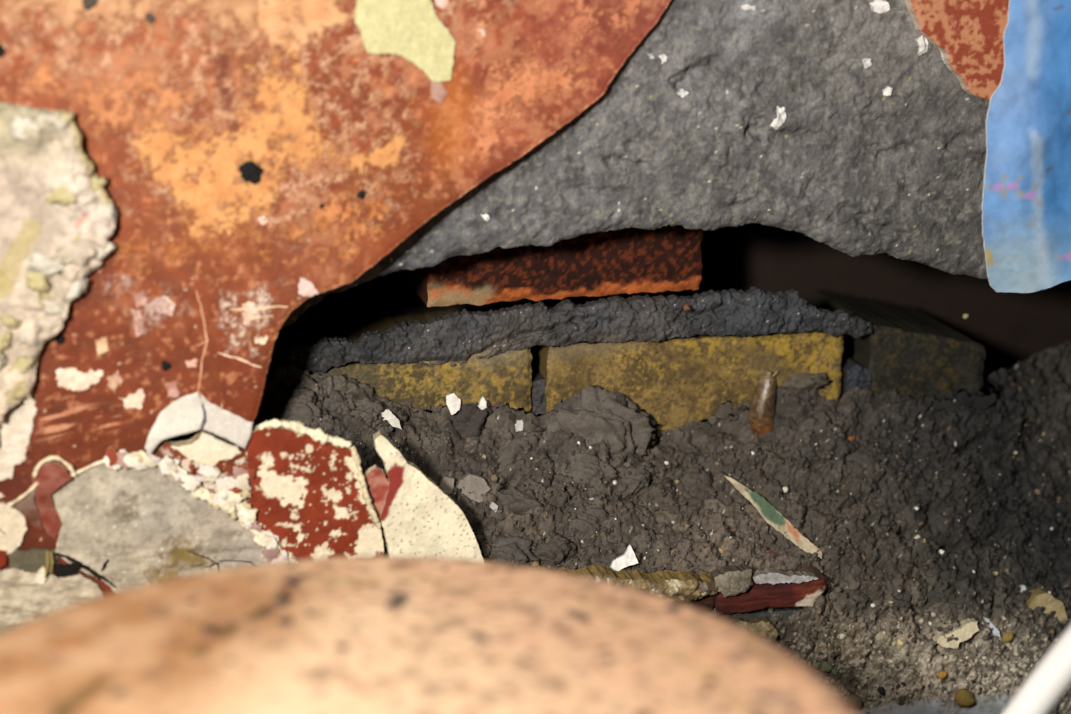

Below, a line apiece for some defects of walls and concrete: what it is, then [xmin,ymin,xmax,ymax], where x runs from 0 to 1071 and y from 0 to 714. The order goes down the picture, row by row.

peeling [454,0,641,164]
peeling [0,0,519,592]
flaking render [610,544,638,571]
peeling [752,568,819,585]
flaking render [933,617,1001,649]